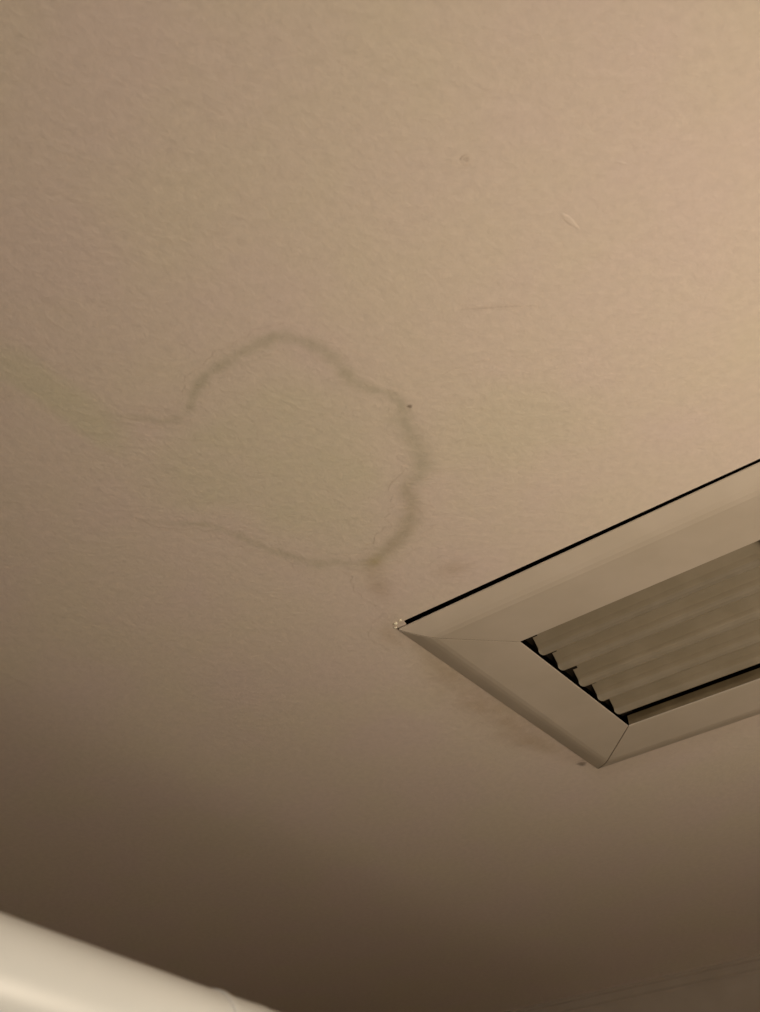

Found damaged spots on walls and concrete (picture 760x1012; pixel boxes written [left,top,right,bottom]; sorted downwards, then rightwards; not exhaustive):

leakage [91,323,644,770]